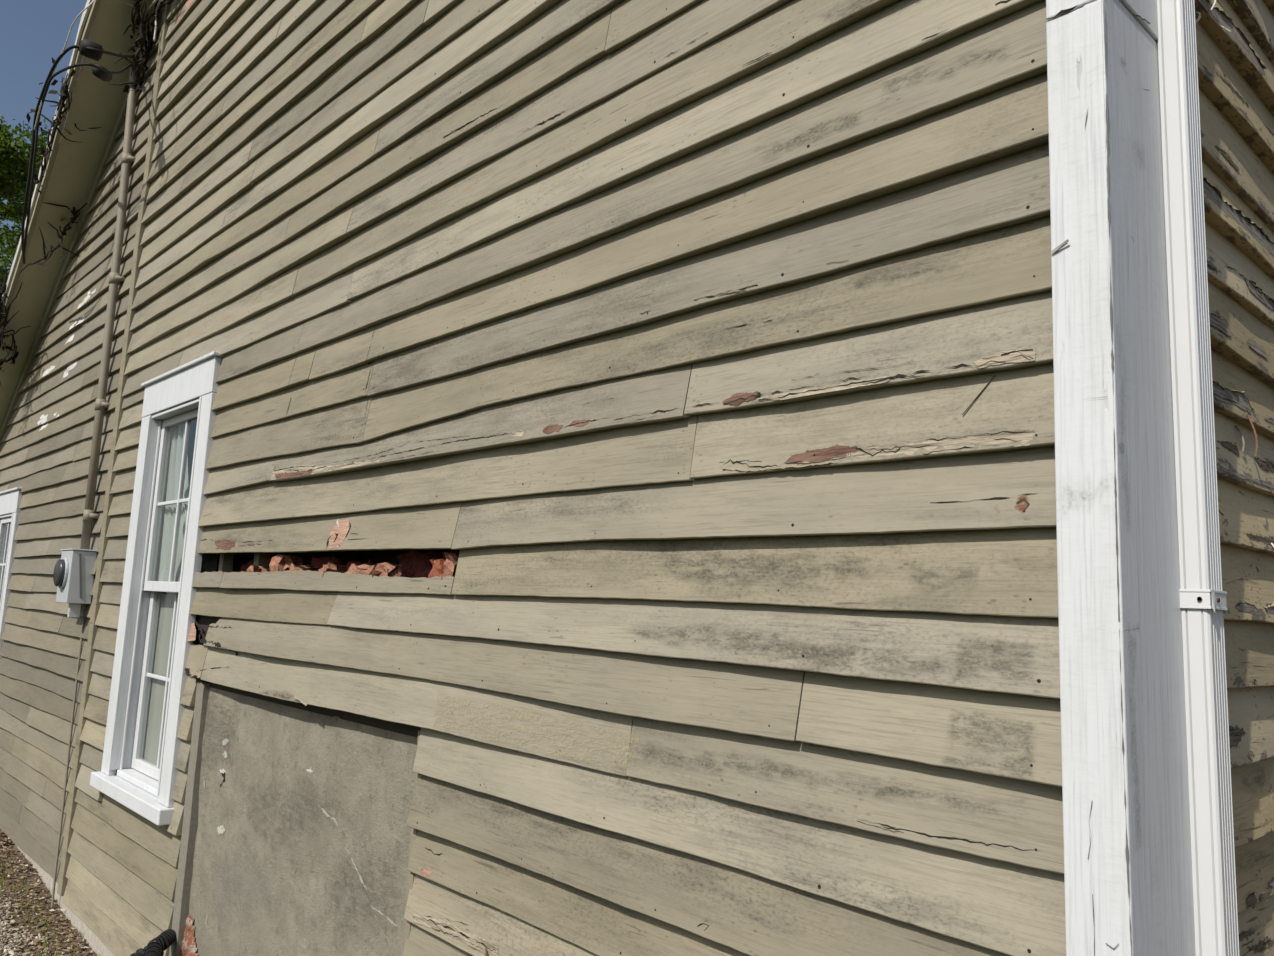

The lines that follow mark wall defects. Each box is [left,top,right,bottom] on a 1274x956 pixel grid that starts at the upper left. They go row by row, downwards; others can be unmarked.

peeling [1195,0,1267,78]
peeling [1203,177,1274,258]
peeling [1207,248,1274,310]
peeling [1209,311,1245,345]
peeling [723,376,890,406]
peeling [1212,379,1274,424]
peeling [543,419,590,434]
peeling [785,429,1035,465]
peeling [1215,440,1274,473]
spalling [201,518,460,589]
peeling [1223,602,1274,615]
spalling [181,915,198,956]